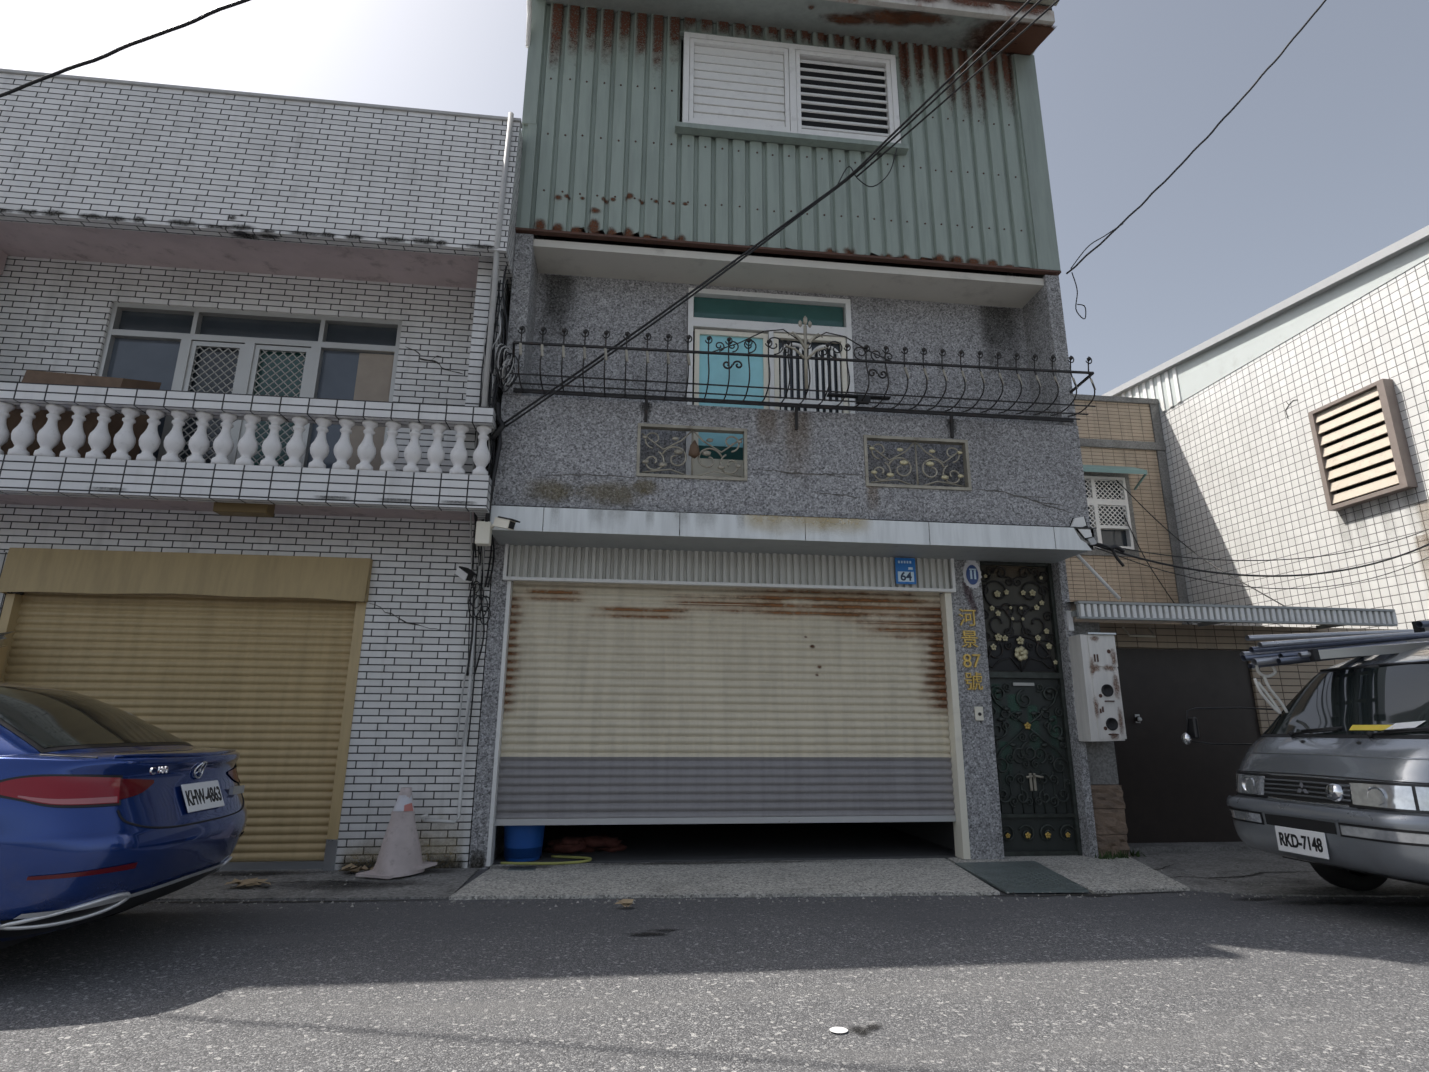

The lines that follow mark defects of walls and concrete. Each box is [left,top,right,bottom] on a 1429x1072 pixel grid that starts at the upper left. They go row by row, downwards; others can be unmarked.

rust [550,0,1056,107]
rust [535,193,687,240]
rust [504,590,579,711]
rust [604,590,948,708]